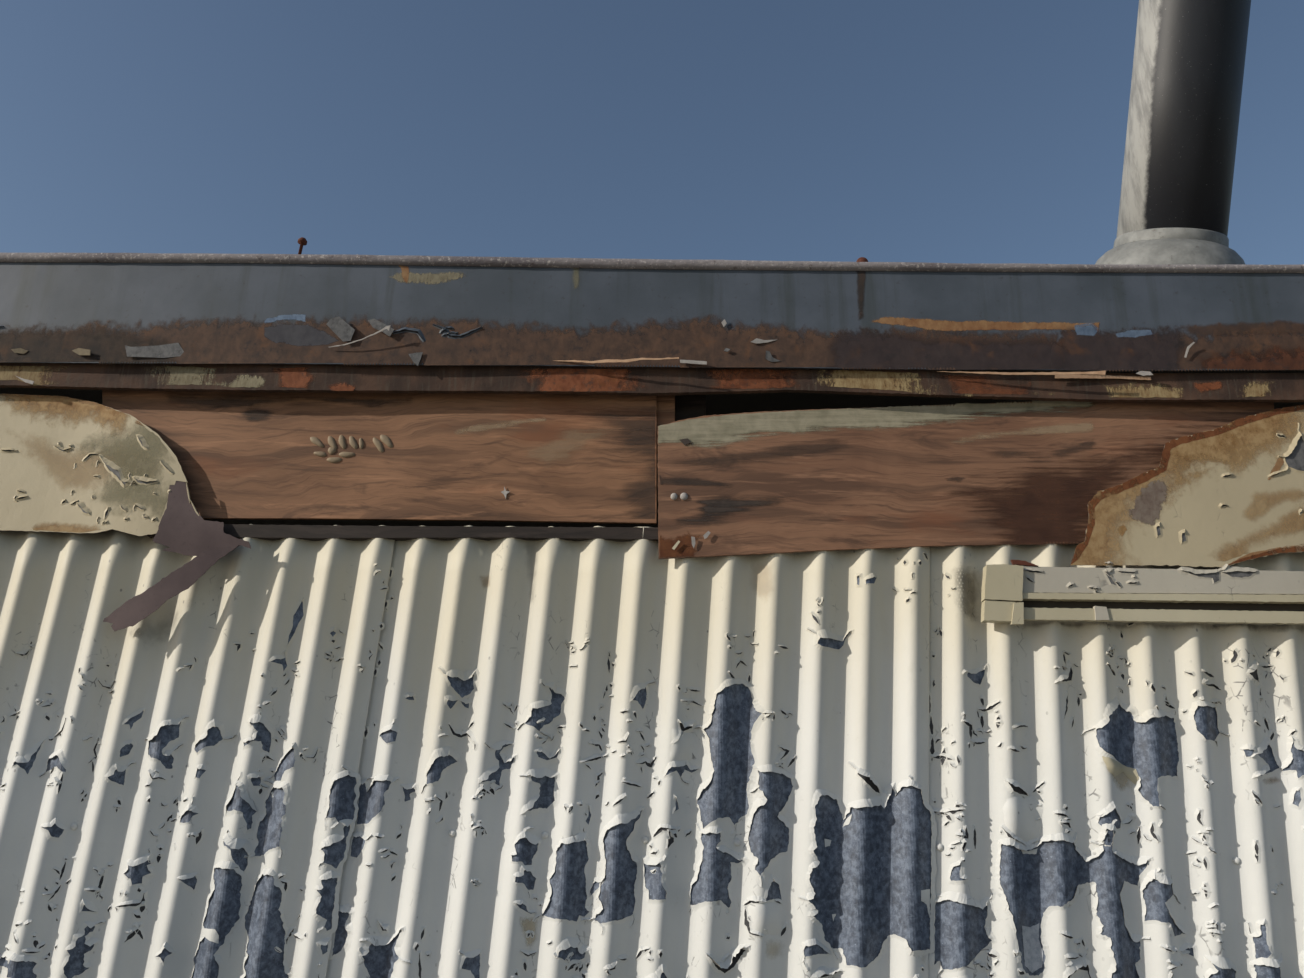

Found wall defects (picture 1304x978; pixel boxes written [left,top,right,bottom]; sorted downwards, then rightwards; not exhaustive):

corrosion [0,271,1304,395]
corrosion [2,394,145,431]
peeling [1277,423,1304,474]
peeling [1177,564,1259,584]
peeling [268,597,306,674]
peeling [438,666,480,711]
peeling [104,708,300,978]
peeling [312,746,461,978]
peeling [477,679,669,964]
peeling [663,678,1304,978]
peeling [0,950,43,978]
peeling [61,898,106,978]